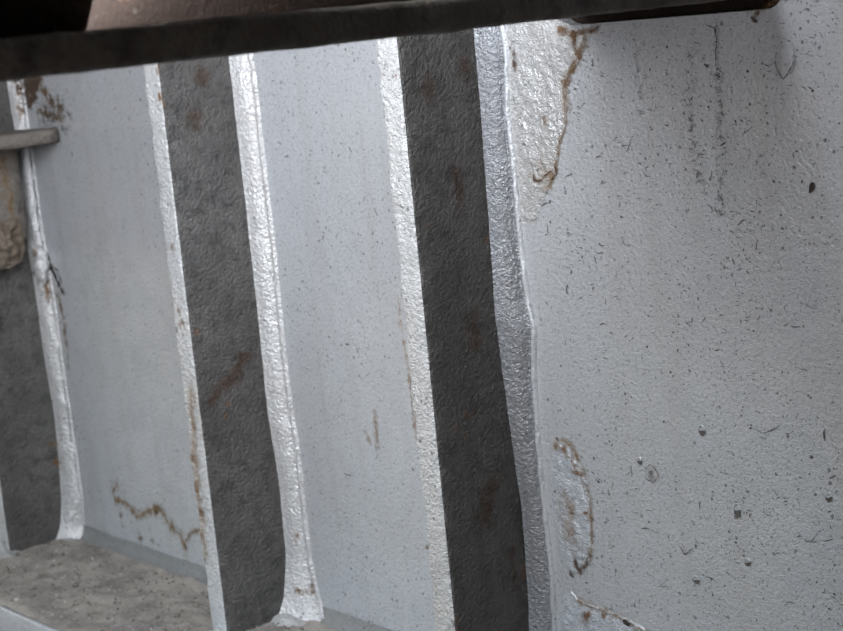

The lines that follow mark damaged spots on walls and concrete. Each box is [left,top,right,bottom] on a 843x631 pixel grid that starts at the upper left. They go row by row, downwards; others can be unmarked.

rust [16,77,63,130]
crack [112,488,199,549]